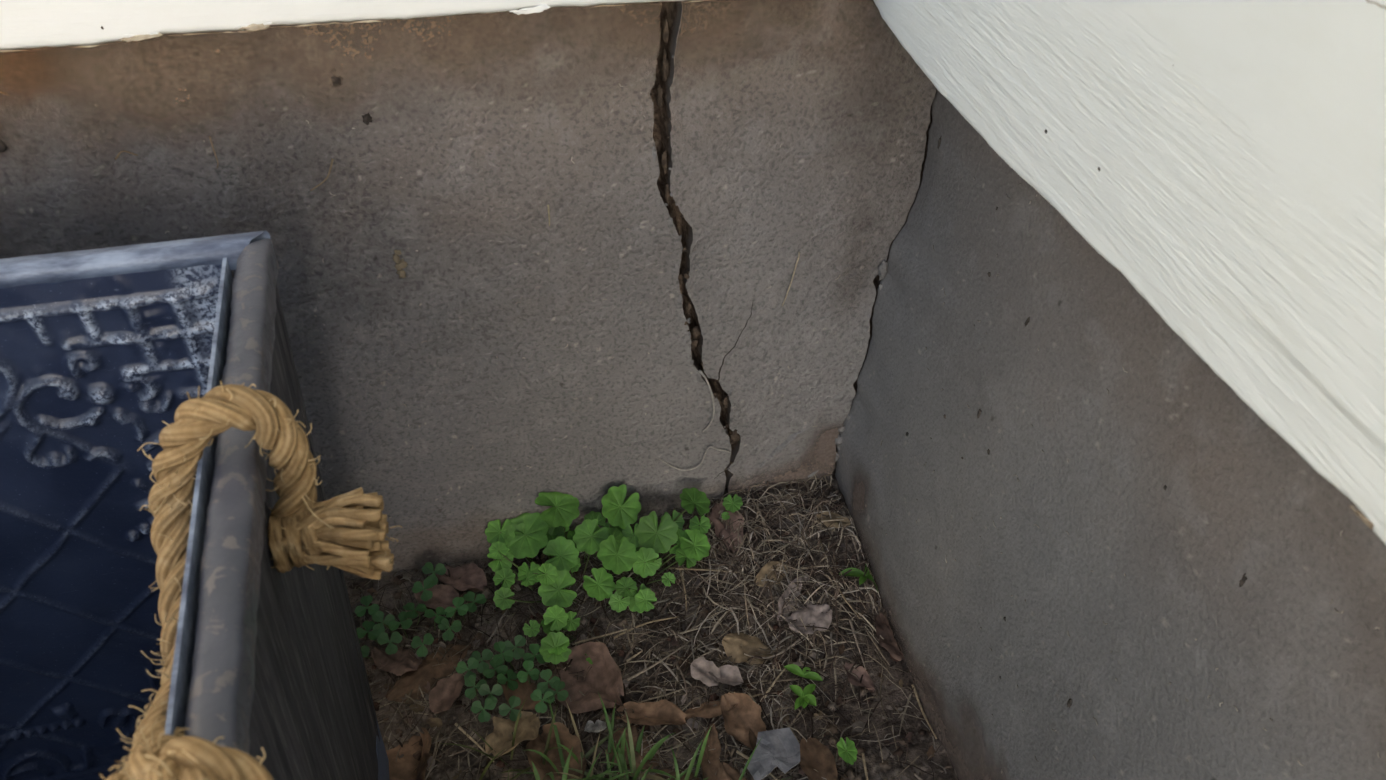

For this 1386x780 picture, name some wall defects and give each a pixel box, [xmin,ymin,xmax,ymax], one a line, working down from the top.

crack [650,1,753,491]